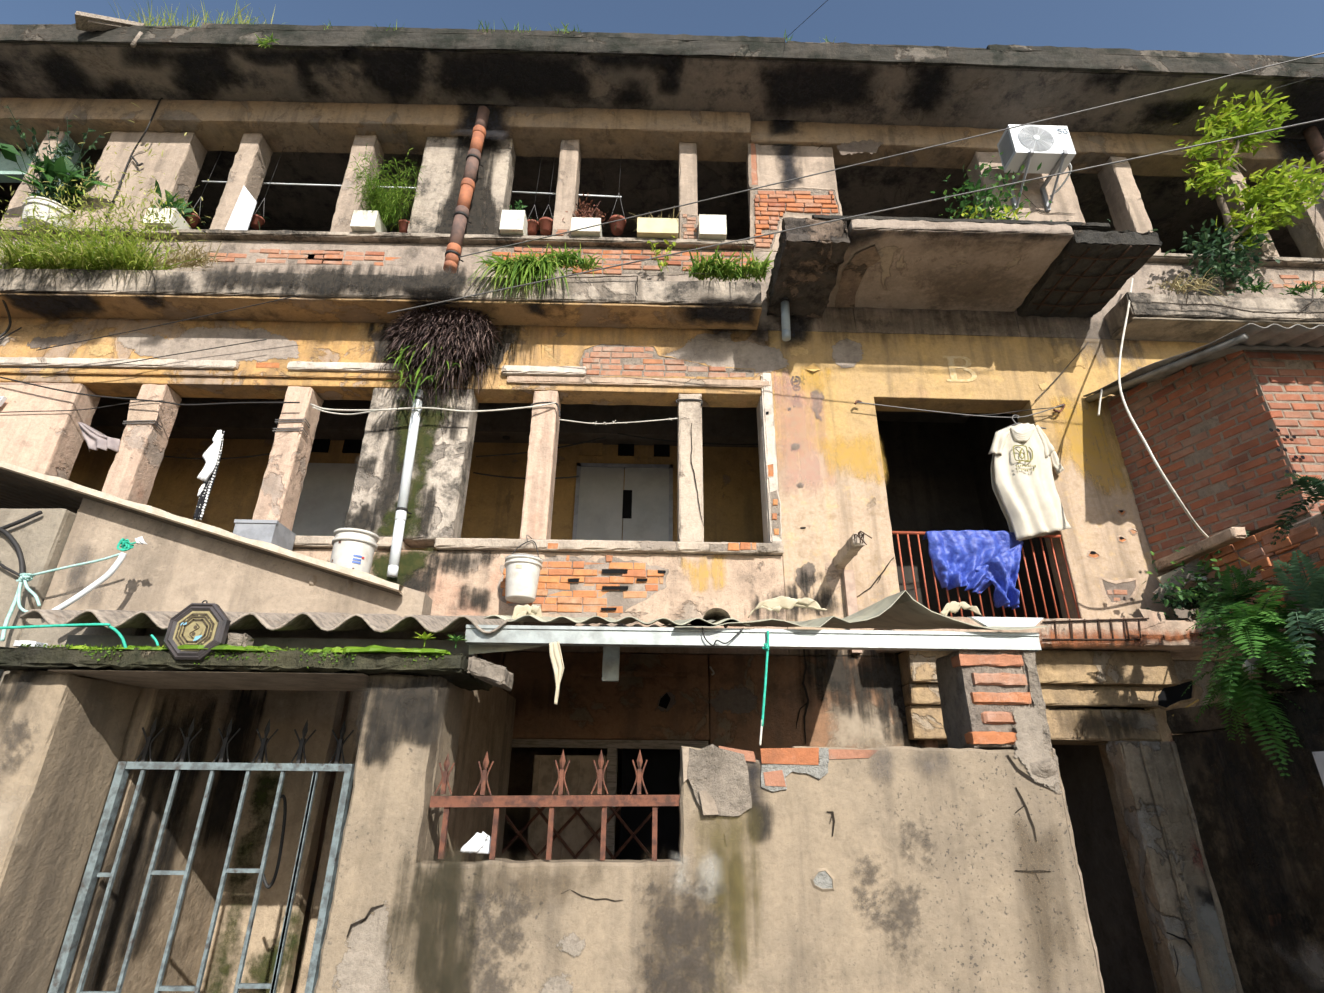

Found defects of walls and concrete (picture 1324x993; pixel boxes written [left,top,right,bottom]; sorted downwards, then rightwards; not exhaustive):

damp [41,52,138,99]
damp [124,45,682,235]
damp [0,291,105,321]
flaking render [576,332,863,422]
damp [345,323,519,537]
flaking render [497,542,669,618]
damp [72,690,283,993]
peeling [682,747,691,783]
peeling [699,790,718,815]
damp [711,762,771,934]
peeling [332,900,422,993]
crack [1166,932,1192,977]